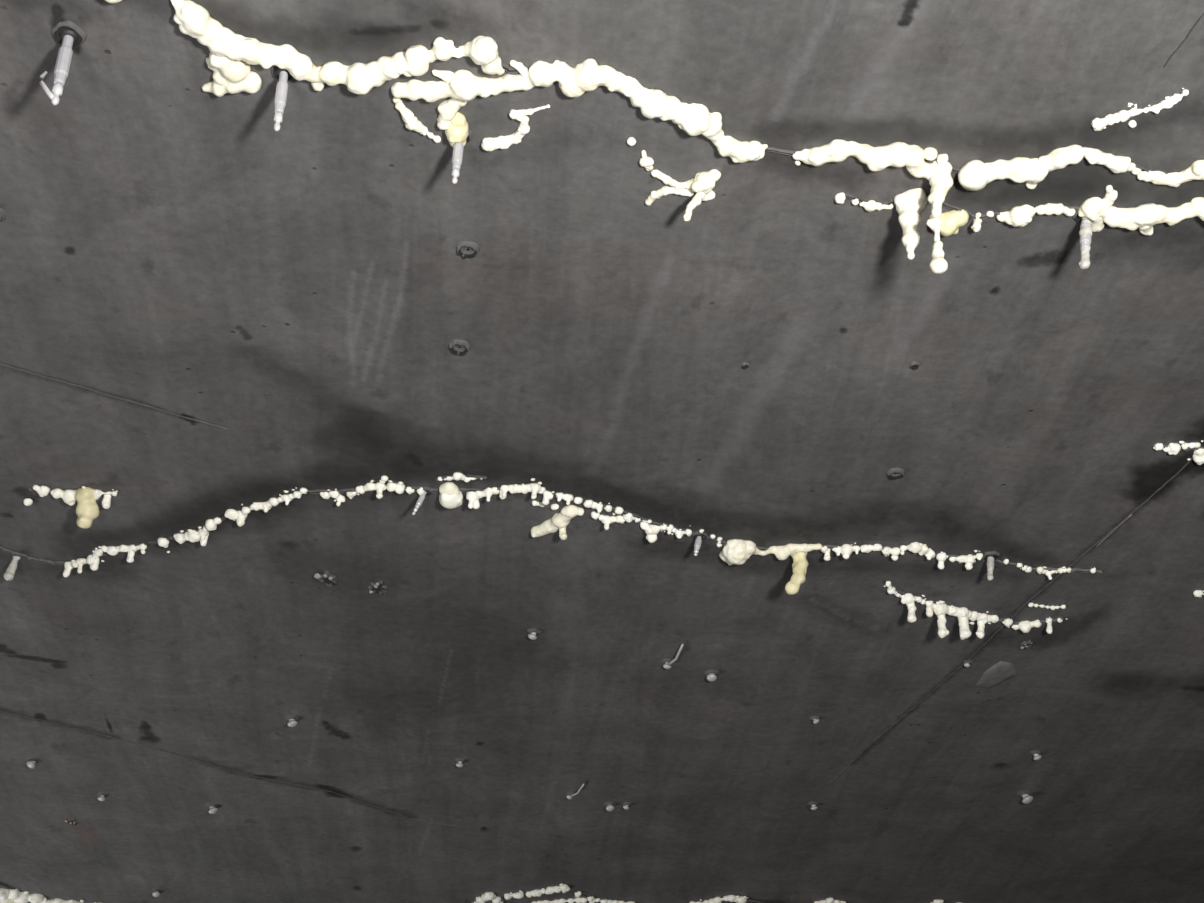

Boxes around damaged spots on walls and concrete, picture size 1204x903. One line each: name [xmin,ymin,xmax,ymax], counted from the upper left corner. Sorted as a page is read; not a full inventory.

crack [497,62,529,78]
crack [924,159,961,173]
crack [1135,164,1182,175]
crack [845,193,894,206]
crack [927,196,1000,219]
crack [1153,444,1204,452]
leakage [1133,430,1204,500]
crack [0,474,509,565]
crack [552,493,727,545]
crack [881,546,1102,574]
crack [0,881,51,900]
crack [485,889,608,903]